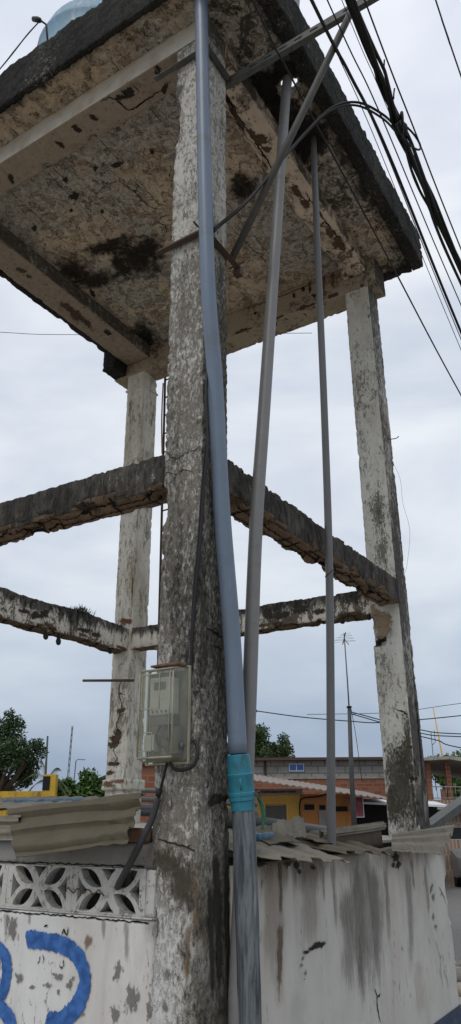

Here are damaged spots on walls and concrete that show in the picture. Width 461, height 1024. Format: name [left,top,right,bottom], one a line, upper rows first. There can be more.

crack [101,84,161,111]
spalling [226,95,272,153]
leakage [231,171,259,201]
spalling [289,184,310,209]
leakage [58,235,162,288]
crack [165,446,200,479]
spalling [0,491,162,545]
spalling [260,513,393,646]
spalling [0,608,114,652]
crack [113,683,124,767]
leakage [384,712,420,832]
peeling [301,941,326,980]